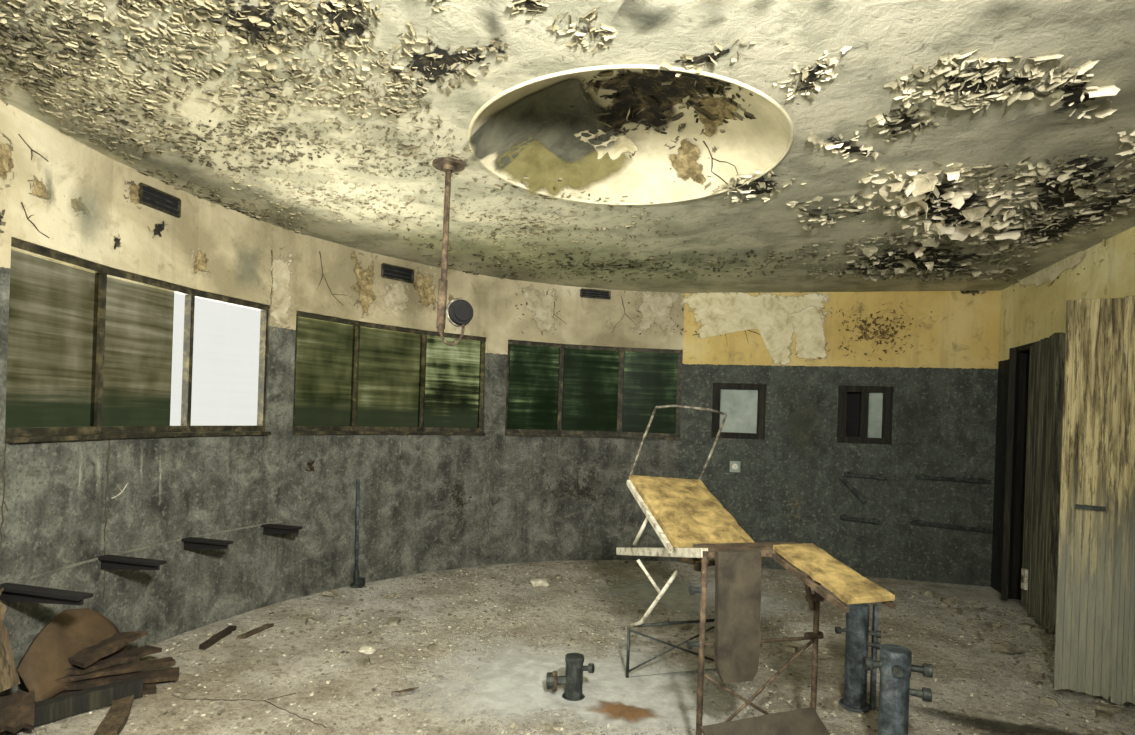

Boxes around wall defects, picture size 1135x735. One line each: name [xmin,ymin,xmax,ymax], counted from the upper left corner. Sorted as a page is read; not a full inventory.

peeling [0,0,1135,365]